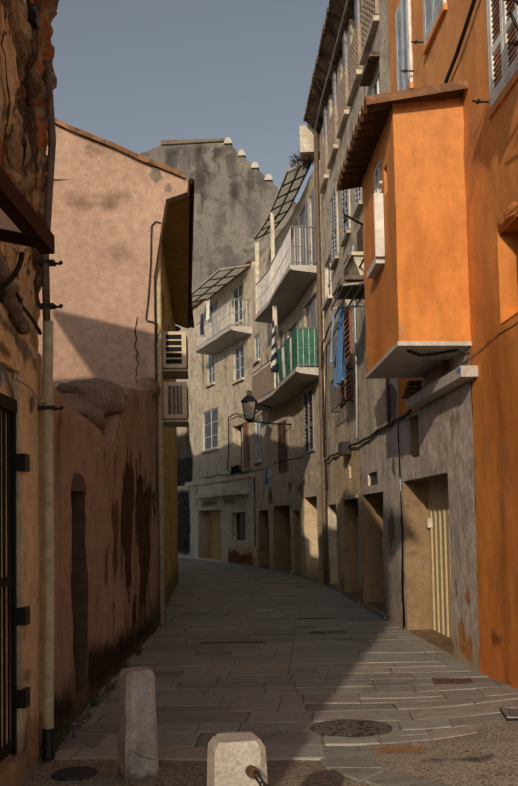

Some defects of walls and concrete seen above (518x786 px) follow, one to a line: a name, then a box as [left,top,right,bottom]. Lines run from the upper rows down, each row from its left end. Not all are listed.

flaking render [458,617,472,660]